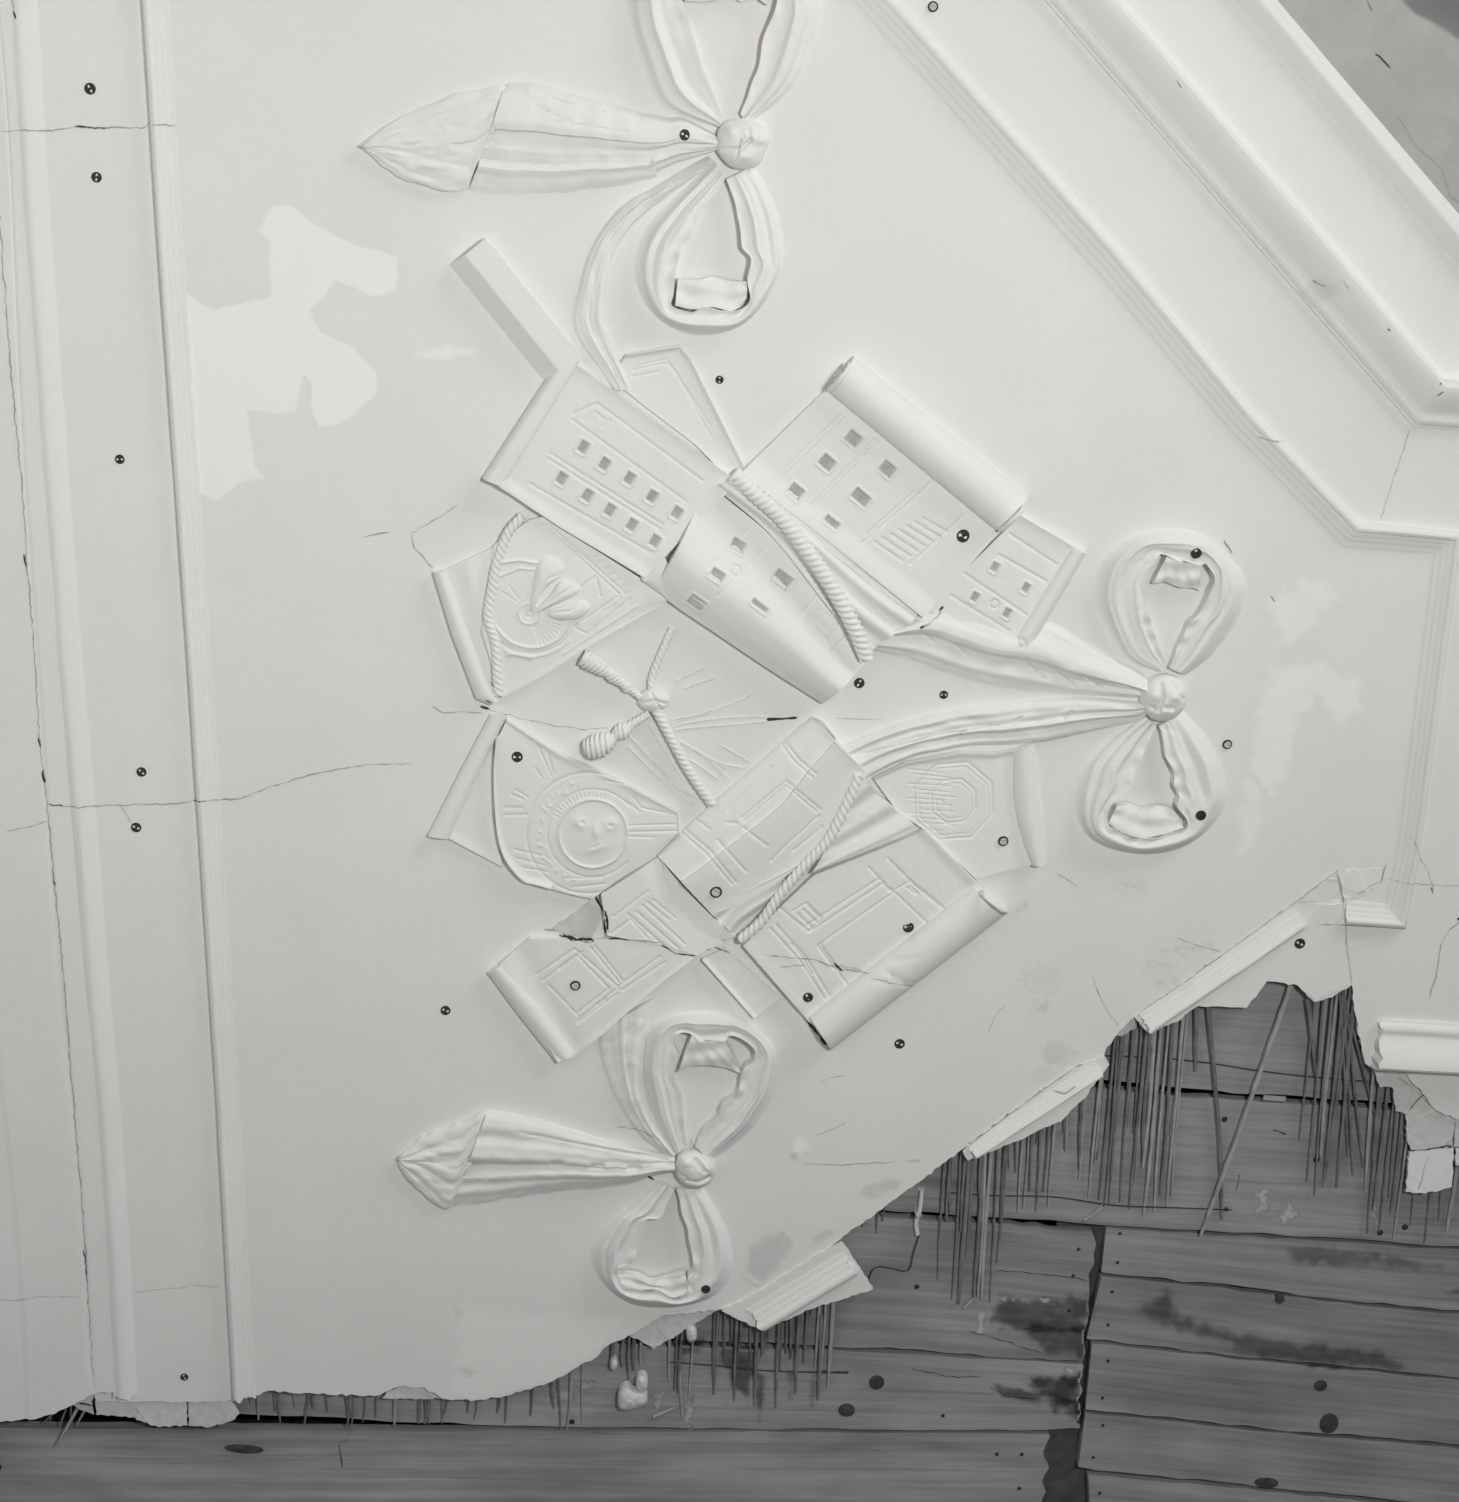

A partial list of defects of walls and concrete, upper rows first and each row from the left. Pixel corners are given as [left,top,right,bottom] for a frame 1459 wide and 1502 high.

crack [4,123,177,132]
crack [0,231,412,1384]
flaking render [552,897,604,938]
crack [1093,839,1459,1026]
flaking render [1300,868,1381,925]
flaking render [1117,1018,1137,1036]
flaking render [1374,1071,1459,1194]
peeling [382,1298,717,1400]
flaking render [74,1395,239,1427]
water stain [1033,1373,1081,1415]